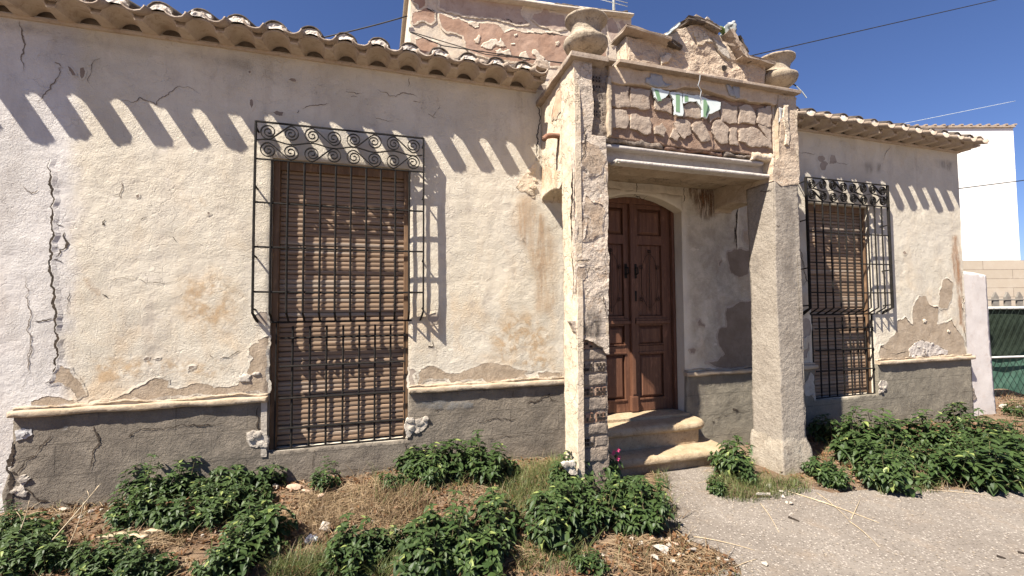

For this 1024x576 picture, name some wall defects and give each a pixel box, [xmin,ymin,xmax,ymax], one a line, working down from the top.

peeling [410,0,570,68]
crack [120,86,201,105]
crack [20,159,70,392]
peeling [28,309,271,408]
peeling [406,361,562,389]
peeling [688,299,752,369]
peeling [877,277,967,361]
crack [89,425,100,471]